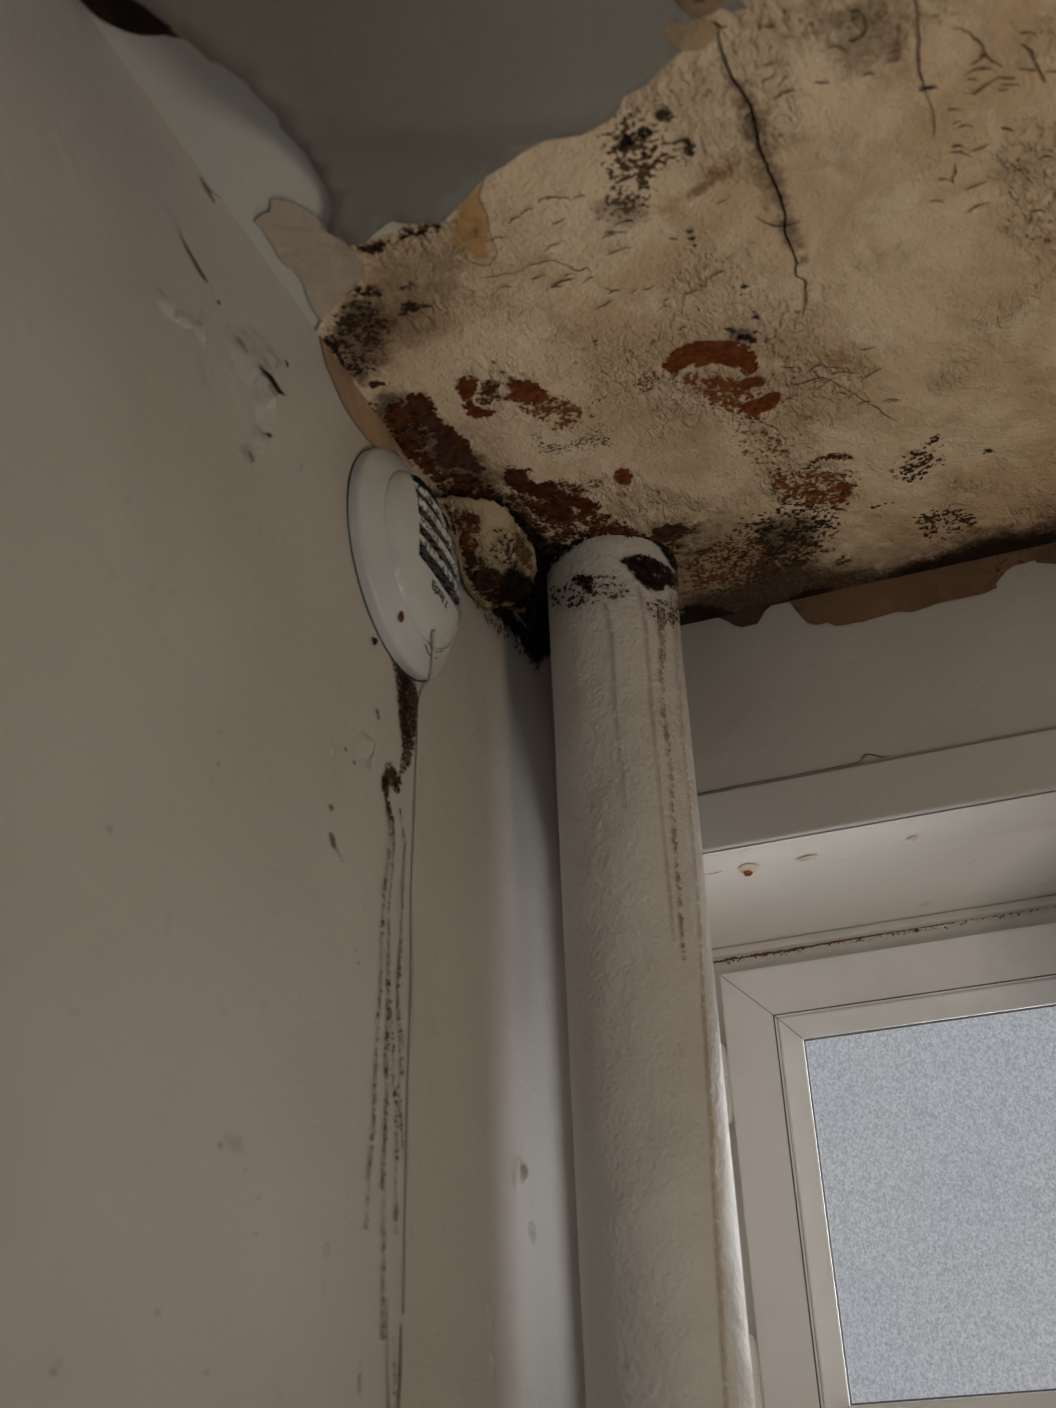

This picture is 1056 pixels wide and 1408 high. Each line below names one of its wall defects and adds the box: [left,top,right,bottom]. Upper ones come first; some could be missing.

water stain [357,196,488,258]
water stain [586,106,696,224]
crack [712,22,807,318]
water stain [323,283,433,385]
spalling [80,0,1056,627]
water stain [724,305,766,343]
water stain [531,423,612,458]
rust [368,340,861,594]
water stain [888,434,945,483]
water stain [442,490,1056,964]
water stain [365,659,418,1408]